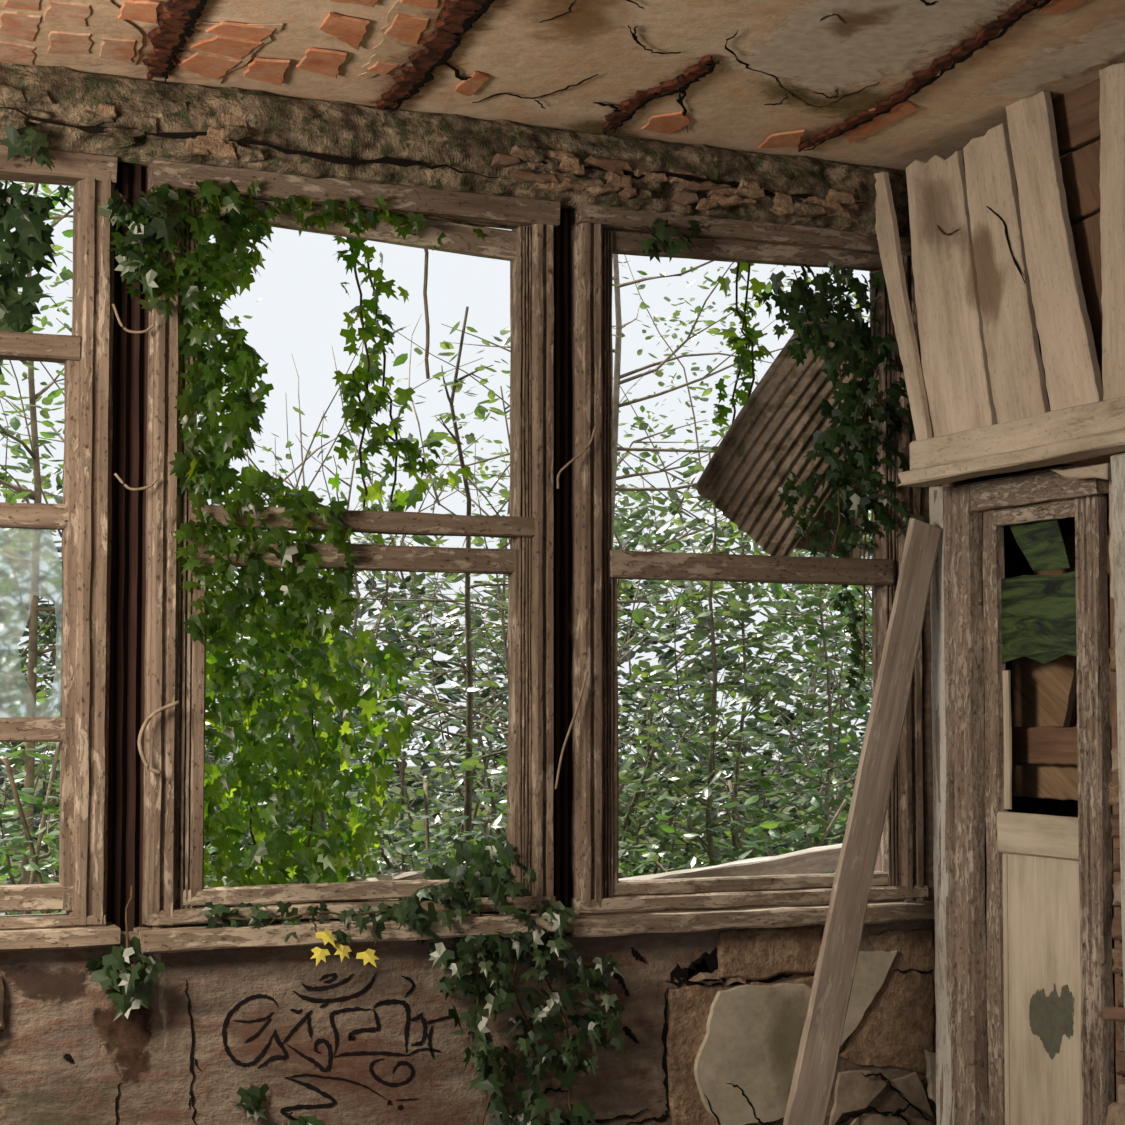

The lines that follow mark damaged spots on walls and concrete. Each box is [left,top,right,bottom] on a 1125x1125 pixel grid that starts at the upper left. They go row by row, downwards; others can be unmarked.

spalling [0,0,159,67]
spalling [168,0,445,86]
crack [370,0,1052,152]
crack [0,107,499,178]
crack [584,166,814,199]
crack [893,967,933,975]
crack [185,980,200,1125]
crack [838,1072,933,1125]